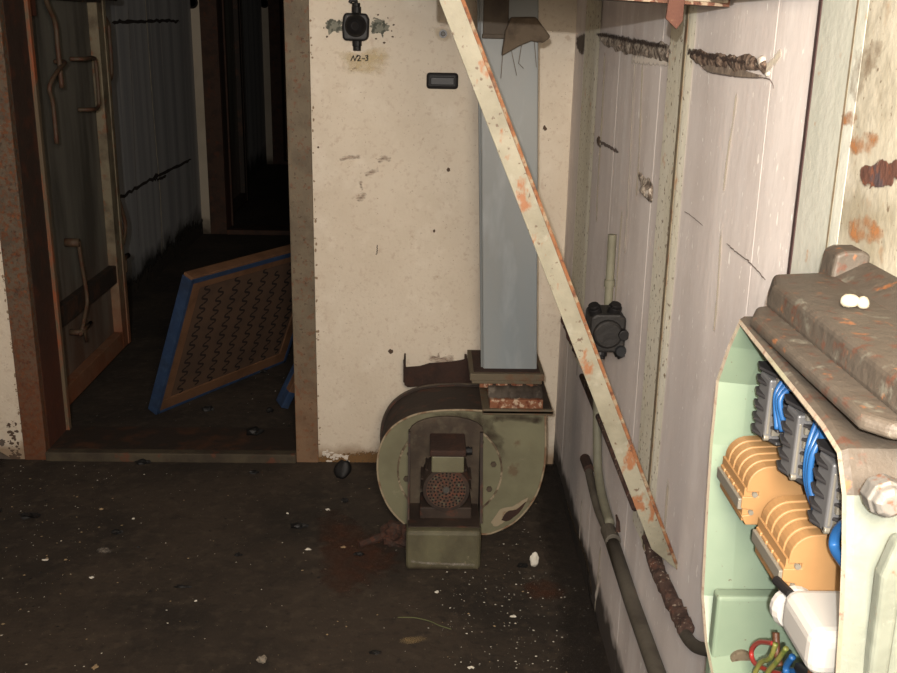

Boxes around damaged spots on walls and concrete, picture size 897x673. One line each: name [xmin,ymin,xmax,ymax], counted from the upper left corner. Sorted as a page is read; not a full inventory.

crack [112,17,179,25]
crack [120,159,191,199]
rust [860,159,897,188]
peeling [0,407,22,459]